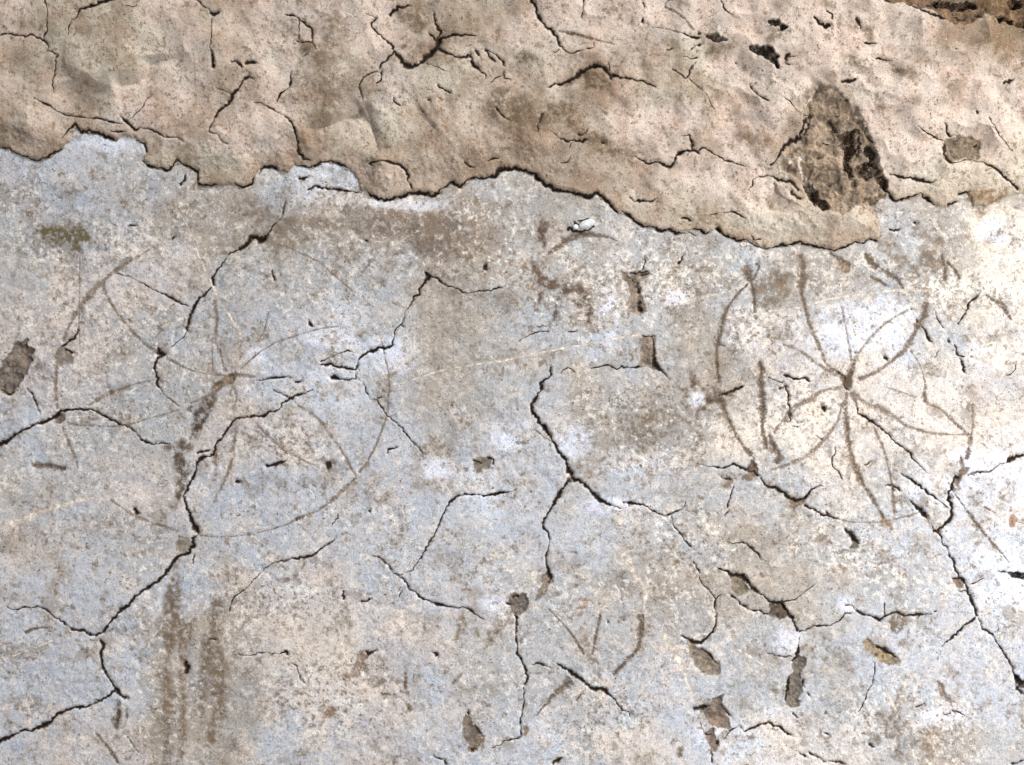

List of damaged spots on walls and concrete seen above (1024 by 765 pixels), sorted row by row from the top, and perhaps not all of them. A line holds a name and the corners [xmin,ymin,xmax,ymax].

crack [0,0,968,251]
spalling [770,87,887,214]
crack [117,201,286,406]
spalling [708,361,783,477]
crack [0,272,517,743]
crack [530,364,937,661]
crack [857,407,1024,674]
spalling [954,457,1024,579]
crack [492,615,630,748]
spalling [682,636,720,675]
spalling [693,694,731,763]
spalling [785,656,809,718]